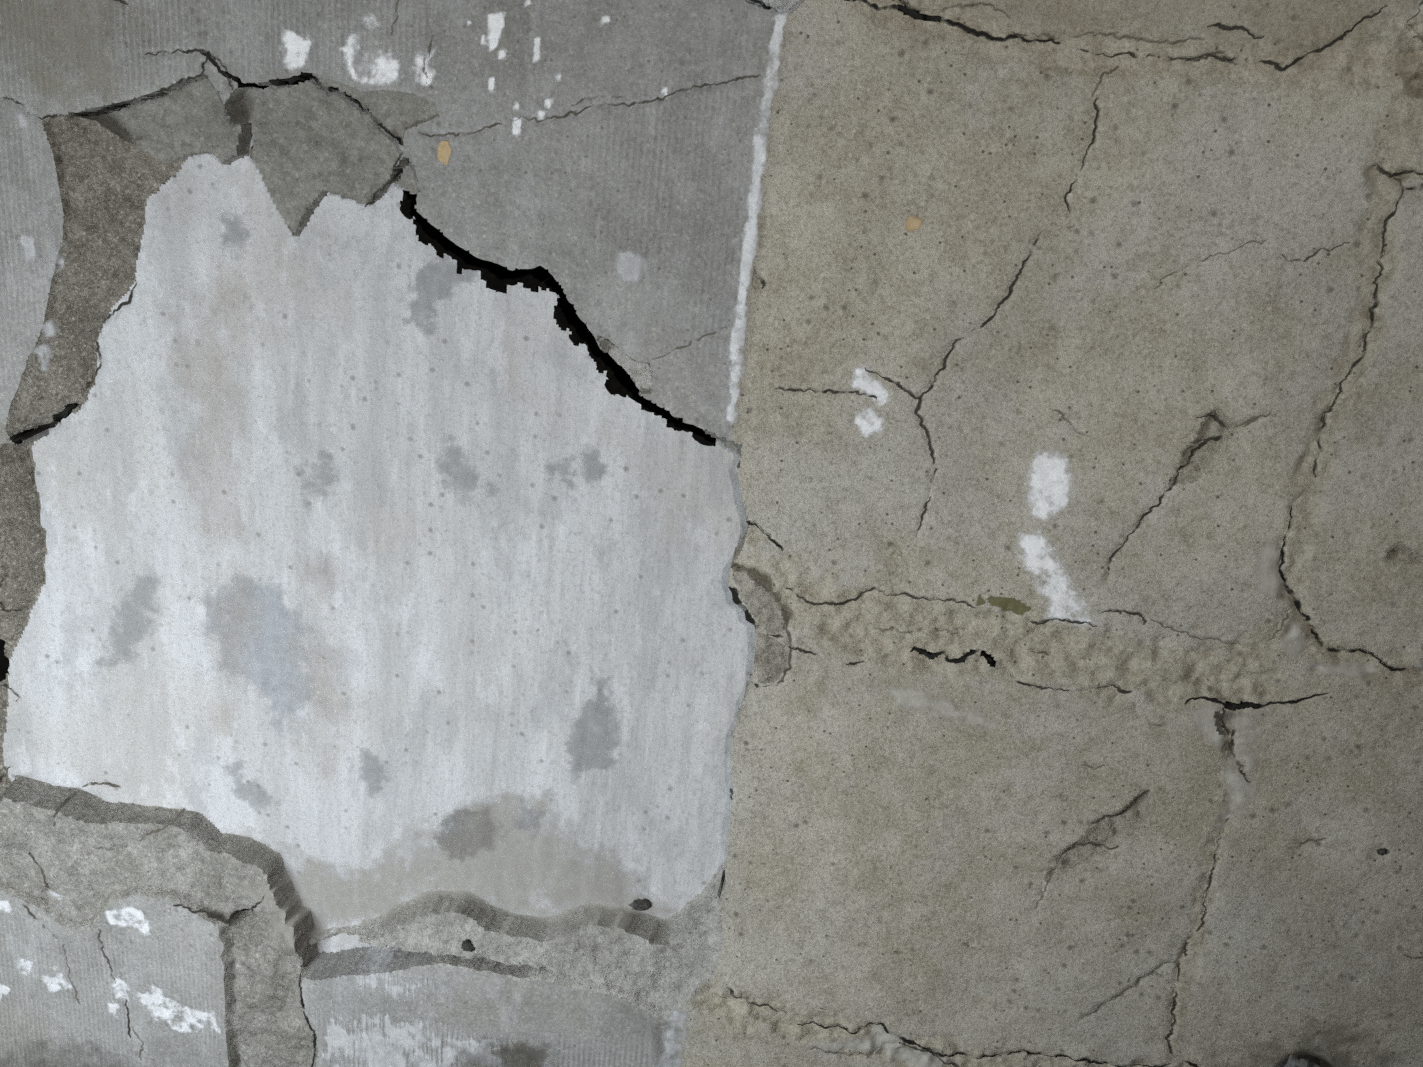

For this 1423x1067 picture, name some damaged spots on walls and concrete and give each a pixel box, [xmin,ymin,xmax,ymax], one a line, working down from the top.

crack [422,40,433,89]
crack [845,0,1423,227]
spalling [0,30,756,1067]
crack [4,49,758,447]
crack [775,235,1039,530]
crack [729,506,1405,783]
crack [1051,409,1085,435]
crack [1108,411,1271,575]
crack [1154,164,1423,478]
crack [726,818,1229,1067]
crack [1035,790,1149,908]
crack [1296,838,1326,848]